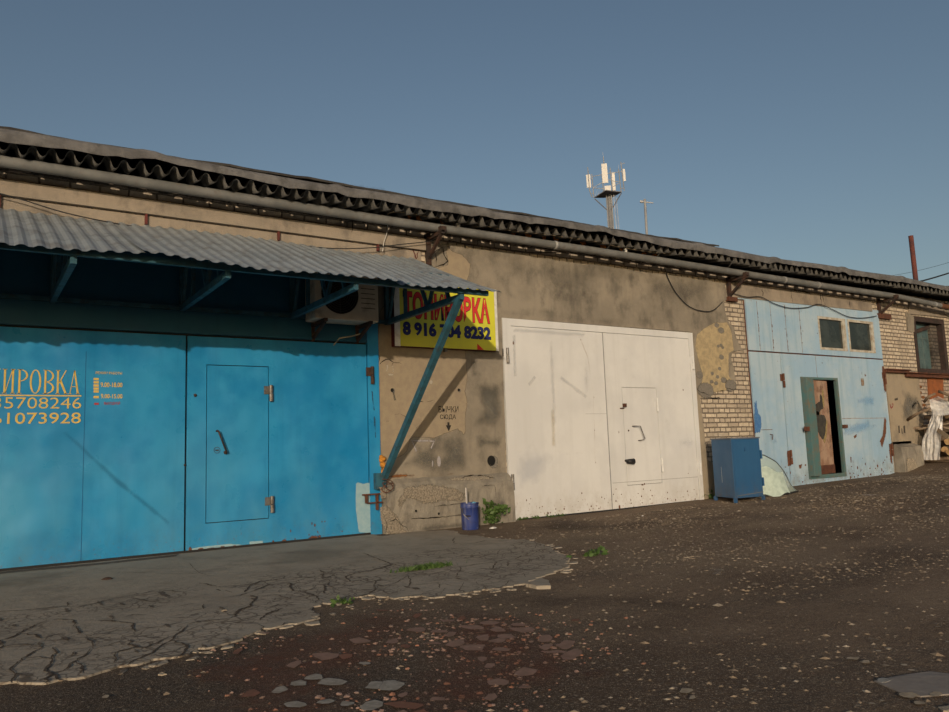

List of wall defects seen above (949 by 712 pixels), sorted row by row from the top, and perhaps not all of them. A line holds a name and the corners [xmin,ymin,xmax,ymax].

peeling [695,322,736,399]
rust [849,418,893,479]
crack [0,475,554,685]